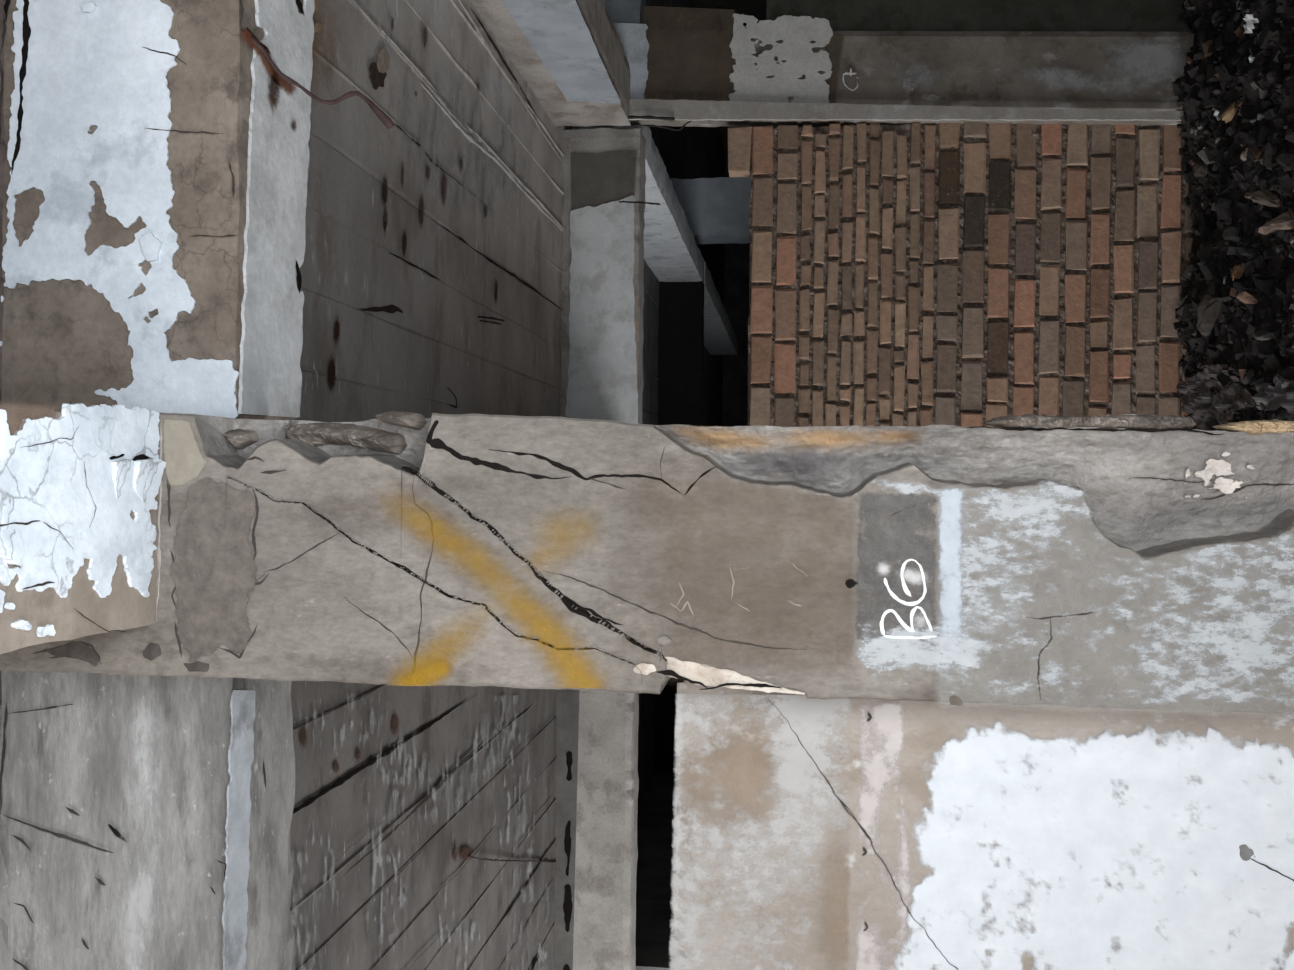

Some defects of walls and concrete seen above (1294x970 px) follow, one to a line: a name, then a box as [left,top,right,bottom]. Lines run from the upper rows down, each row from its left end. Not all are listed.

corrosion [241,28,394,129]
peeling [729,13,833,103]
peeling [0,0,433,672]
crack [227,420,807,670]
peeling [565,195,1294,970]
crack [293,689,477,814]
crack [320,734,491,876]
crack [439,751,573,970]
crack [775,706,958,970]